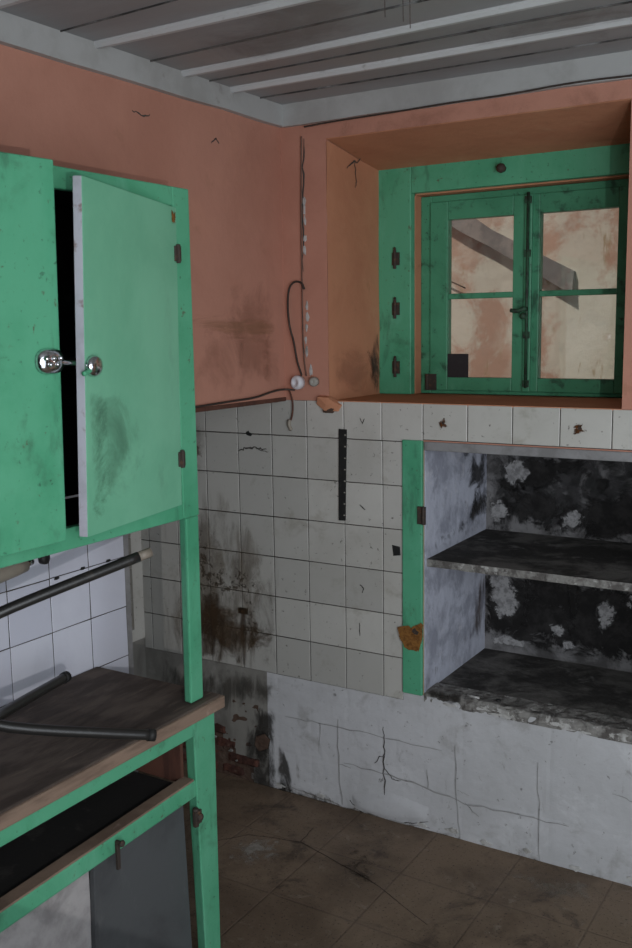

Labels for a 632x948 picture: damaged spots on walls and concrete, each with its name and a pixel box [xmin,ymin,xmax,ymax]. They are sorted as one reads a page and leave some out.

leakage [466,453,632,543]
leakage [199,543,268,663]
leakage [485,575,632,661]
spalling [214,700,260,782]
spalling [424,683,632,745]
crack [285,716,569,859]